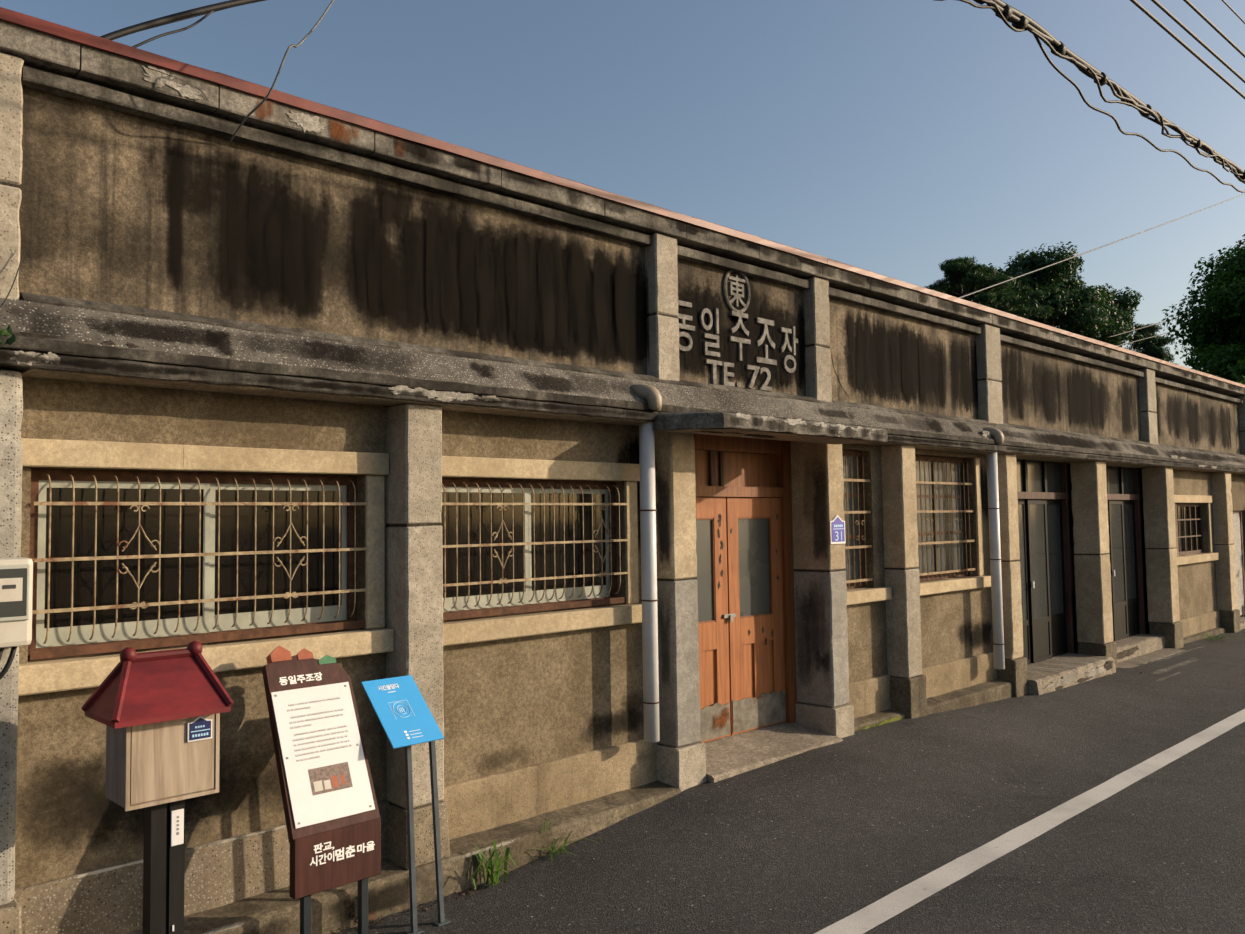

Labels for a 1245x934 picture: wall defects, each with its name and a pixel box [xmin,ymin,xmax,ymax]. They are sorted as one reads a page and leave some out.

water stain [396,140,427,157]
water stain [454,154,480,172]
water stain [505,169,544,184]
water stain [151,137,329,317]
water stain [349,182,650,362]
water stain [90,319,233,355]
water stain [471,363,494,377]
water stain [511,373,645,416]
water stain [813,312,982,446]
water stain [1002,349,1245,471]
water stain [960,624,991,647]
water stain [588,704,637,737]